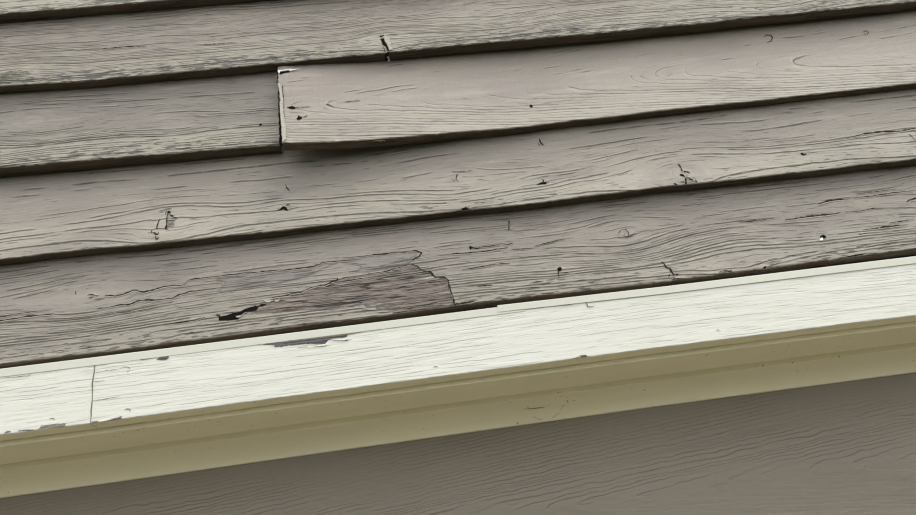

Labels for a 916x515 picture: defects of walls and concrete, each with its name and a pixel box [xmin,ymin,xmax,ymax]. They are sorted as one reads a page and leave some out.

peeling [199,250,475,321]
peeling [263,332,360,348]
crack [90,366,123,423]